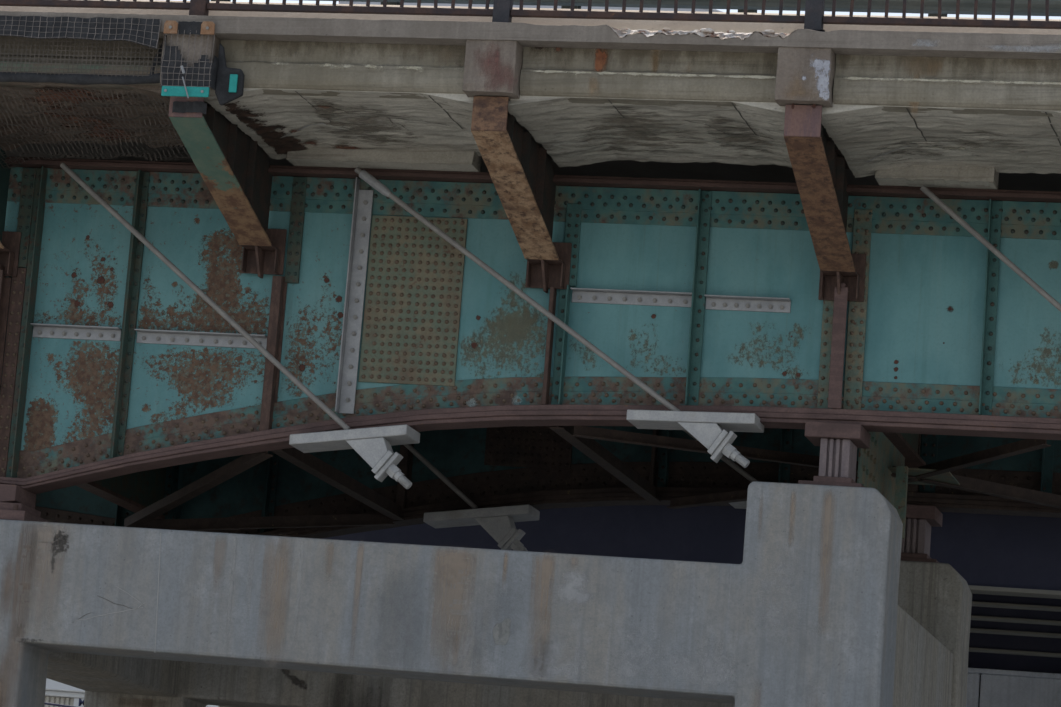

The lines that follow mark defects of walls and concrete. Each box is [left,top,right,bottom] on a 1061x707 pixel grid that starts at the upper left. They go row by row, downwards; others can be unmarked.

spalling [609,26,797,40]
rust [37,235,122,327]
rust [138,218,269,335]
rust [23,340,120,451]
rust [142,347,265,423]
rust [1008,329,1061,387]
peeling [51,530,69,574]